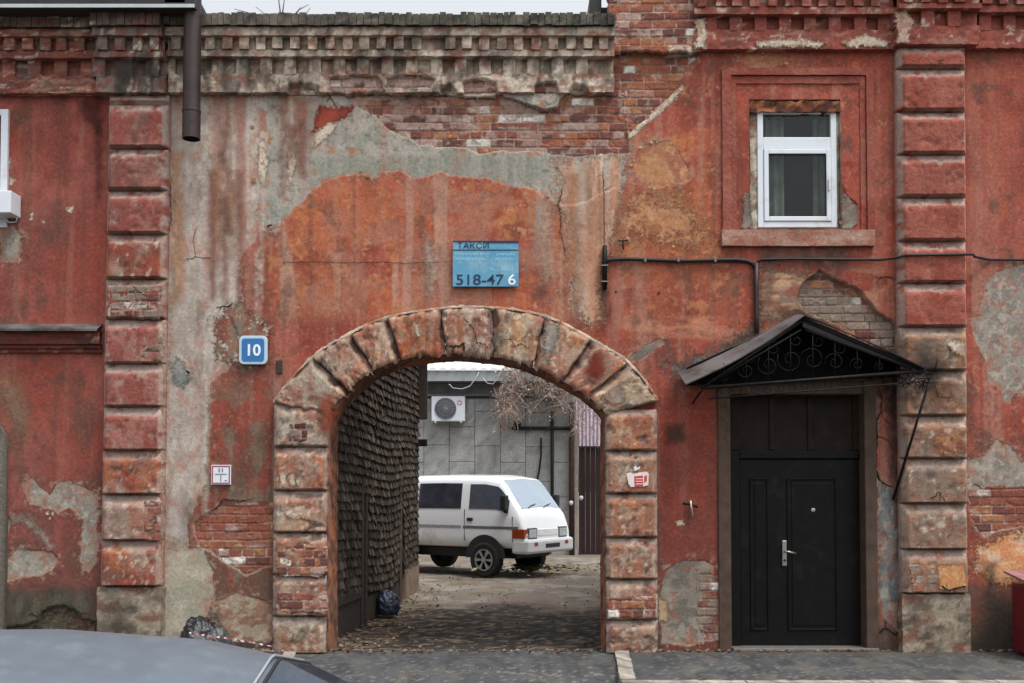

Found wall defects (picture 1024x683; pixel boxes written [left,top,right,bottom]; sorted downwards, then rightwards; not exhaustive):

crack [553,189,566,258]
peeling [839,193,858,230]
peeling [107,0,722,644]
crack [448,318,528,354]
flaking render [629,261,895,382]
peeling [947,265,1024,403]
peeling [7,549,59,580]
peeling [22,478,100,571]
peeling [877,431,1024,631]